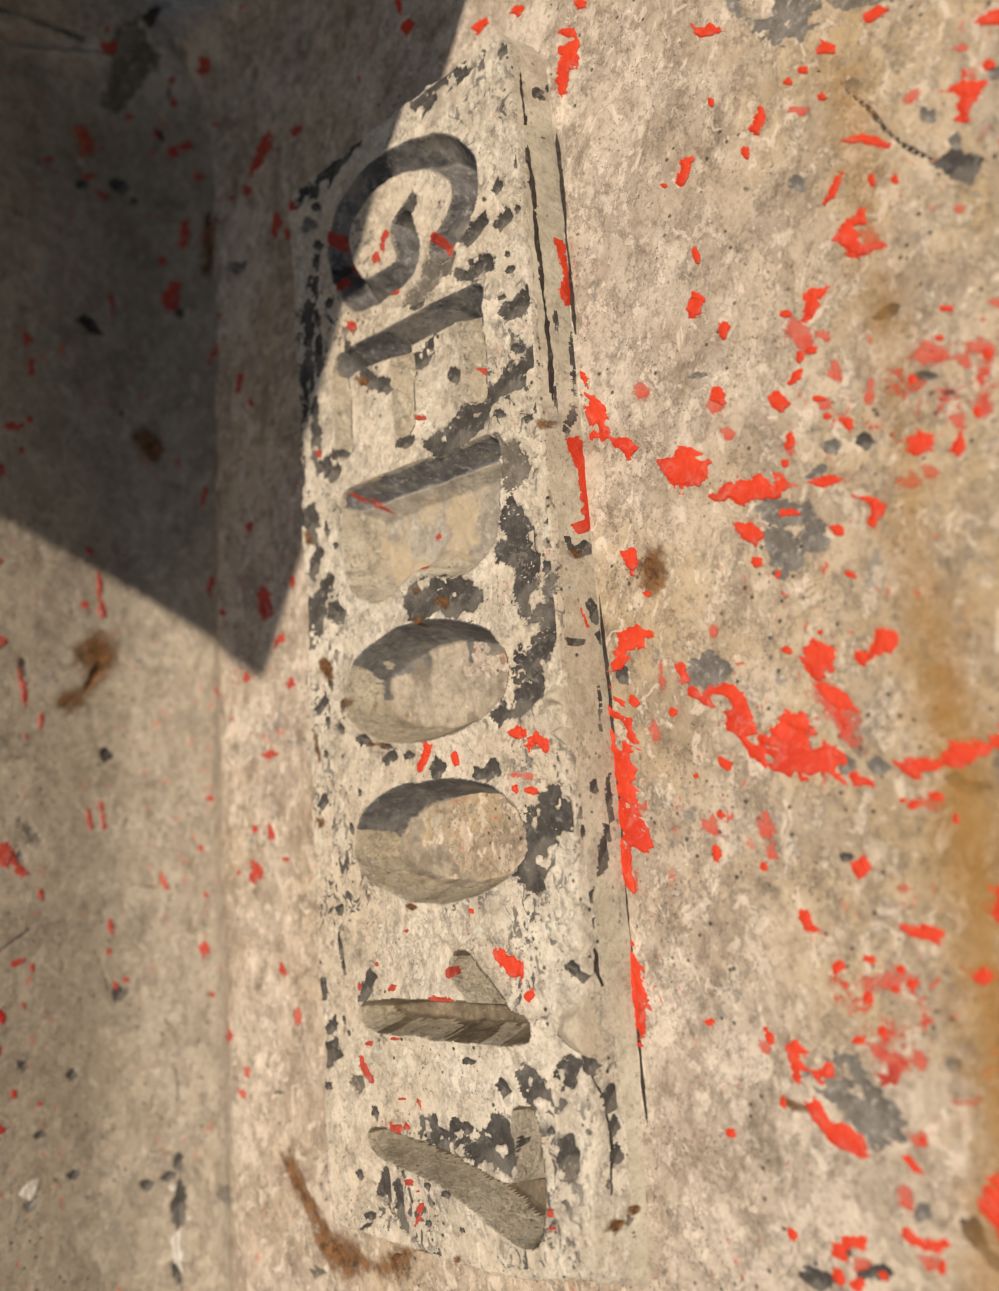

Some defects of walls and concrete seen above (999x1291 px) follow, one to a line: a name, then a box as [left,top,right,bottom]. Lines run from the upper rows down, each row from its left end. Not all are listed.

peeling [532,25,580,101]
peeling [656,284,999,581]
rust [57,631,115,712]
peeling [659,625,999,824]
peeling [492,946,536,1003]
peeling [630,940,653,1048]
spalling [325,1014,374,1094]
spalling [371,1053,624,1190]
spalling [759,955,951,1276]
rust [283,1149,416,1278]
spalling [355,1166,451,1234]
peeling [798,1234,894,1291]